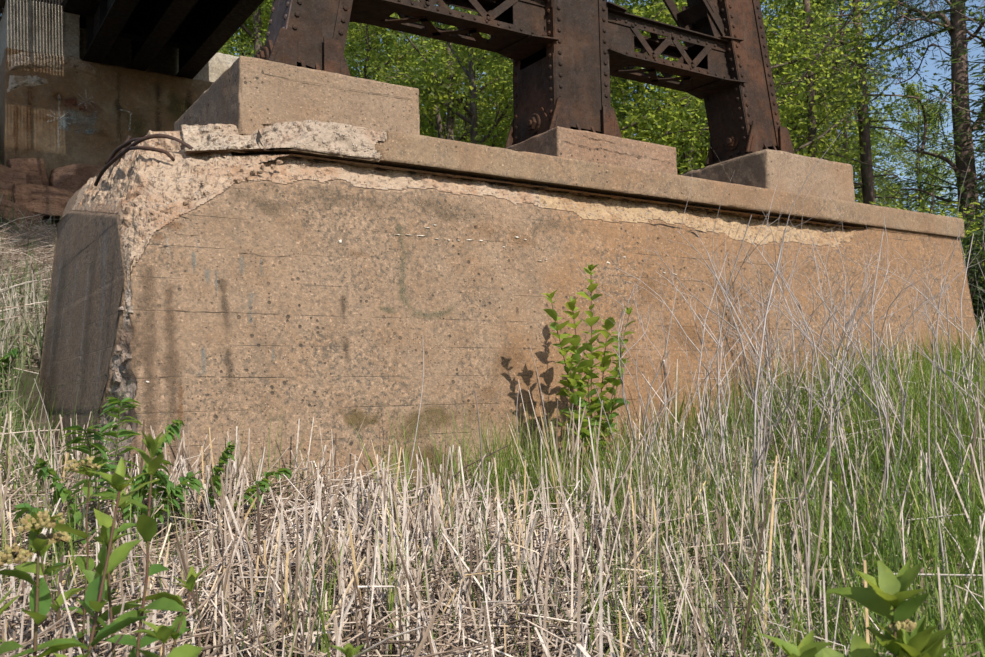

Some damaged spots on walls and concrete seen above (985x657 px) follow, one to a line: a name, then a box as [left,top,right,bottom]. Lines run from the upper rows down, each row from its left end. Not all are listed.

spalling [71,120,864,512]